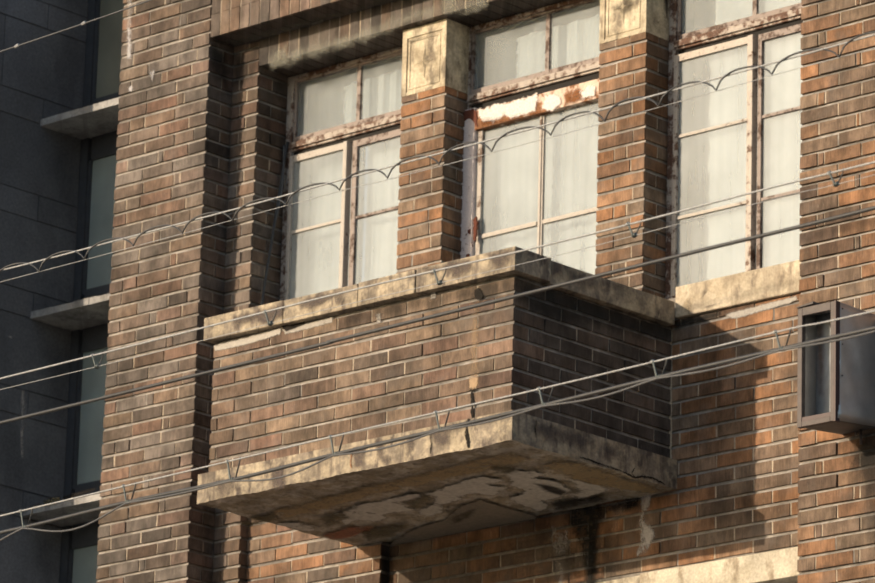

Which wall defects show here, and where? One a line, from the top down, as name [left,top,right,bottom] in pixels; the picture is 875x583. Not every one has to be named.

peeling [463,85,596,127]
peeling [468,216,478,243]
leakage [428,260,470,275]
leakage [489,251,508,265]
leakage [234,305,282,324]
leakage [300,294,340,307]
leakage [524,286,662,335]
crack [464,388,476,448]
leakage [567,496,655,583]